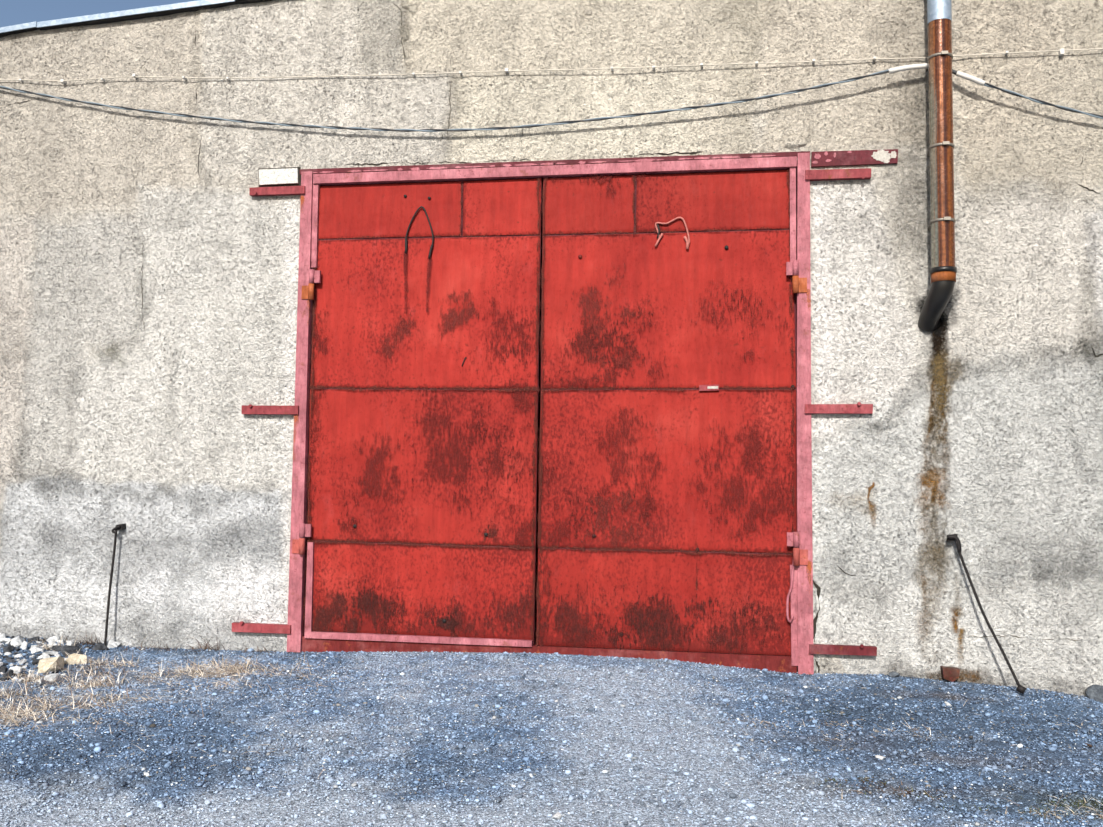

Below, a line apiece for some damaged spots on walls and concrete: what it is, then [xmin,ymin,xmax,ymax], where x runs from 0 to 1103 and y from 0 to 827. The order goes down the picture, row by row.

corrosion [928,18,955,268]
corrosion [293,169,796,655]
corrosion [922,316,961,562]
corrosion [953,608,964,648]